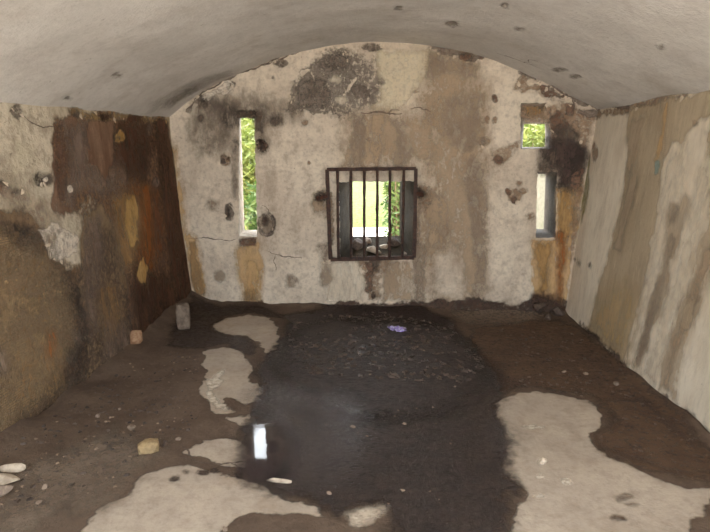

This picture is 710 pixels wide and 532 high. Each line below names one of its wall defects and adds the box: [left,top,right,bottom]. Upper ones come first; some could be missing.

crack [361,107,431,115]
flaking render [515,71,668,160]
flaking render [35,173,53,187]
flaking render [31,206,79,264]
damp [78,204,133,379]
rust [237,237,264,302]
damp [167,54,710,532]
rust [531,181,583,302]